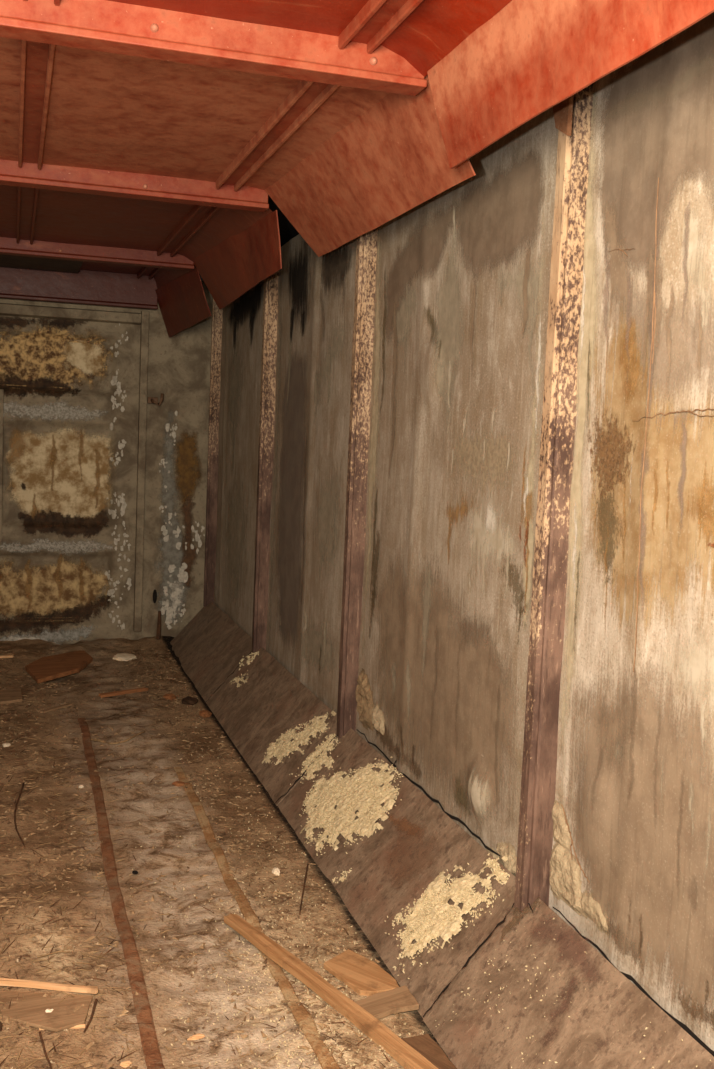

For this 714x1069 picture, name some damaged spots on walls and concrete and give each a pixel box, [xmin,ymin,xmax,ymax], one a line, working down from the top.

leakage [157,413,188,626]
rust [176,432,201,587]
leakage [363,152,544,813]
leakage [562,12,714,1027]
rust [587,311,714,626]
crack [609,177,714,672]